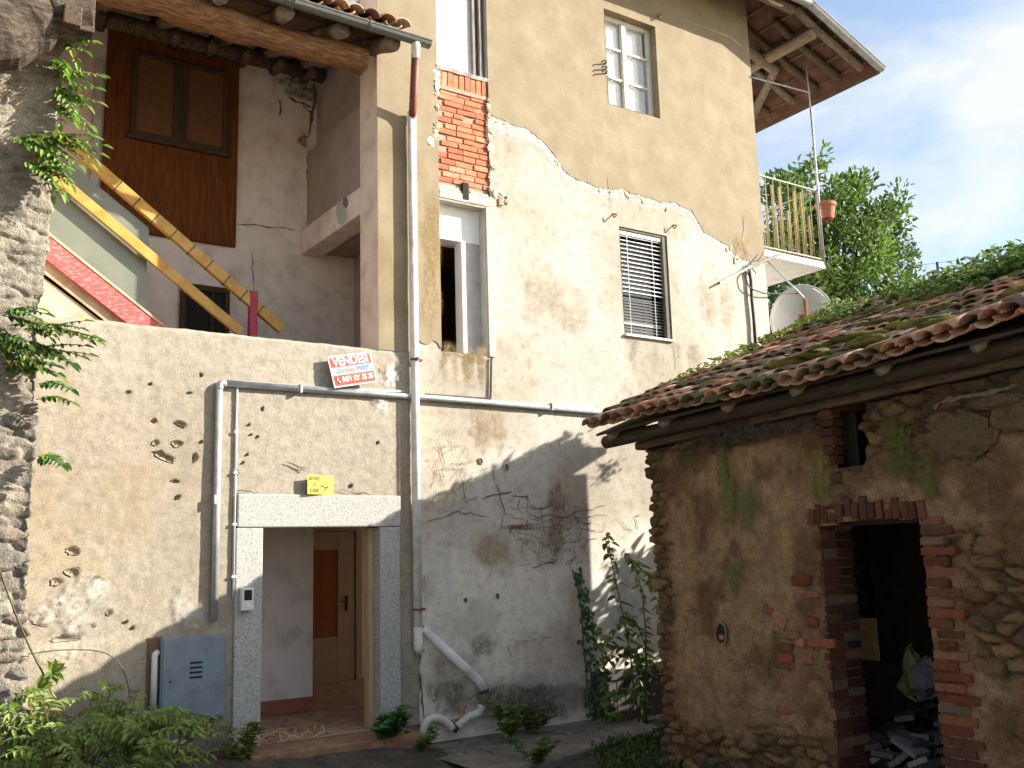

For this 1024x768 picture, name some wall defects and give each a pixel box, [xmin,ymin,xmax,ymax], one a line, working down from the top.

crack [279,83,317,179]
flaking render [427,64,763,265]
crack [239,223,294,231]
flaking render [152,439,184,464]
crack [425,430,640,570]
flaking render [29,568,114,659]
flaking render [762,604,837,680]